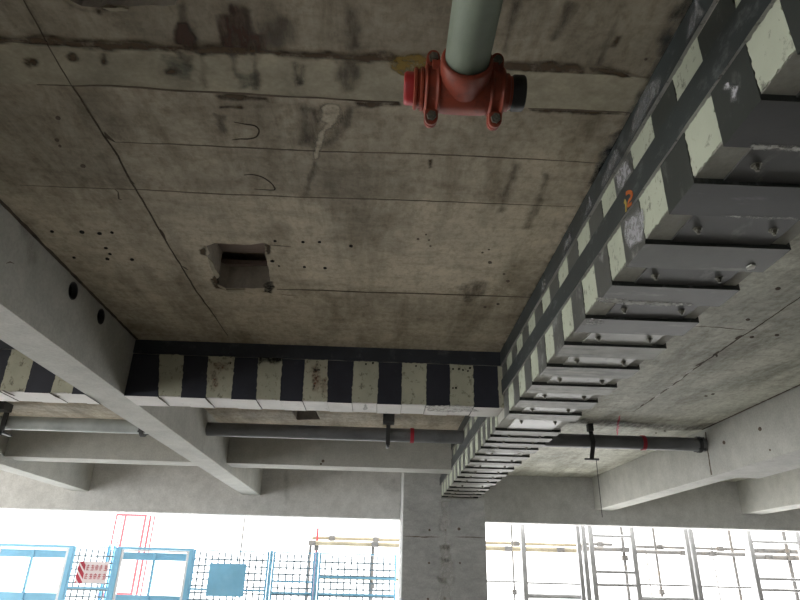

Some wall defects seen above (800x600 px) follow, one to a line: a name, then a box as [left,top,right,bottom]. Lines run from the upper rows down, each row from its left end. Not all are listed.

damp [0,4,397,87]
crack [23,0,589,336]
damp [300,102,401,165]
crack [0,199,138,339]